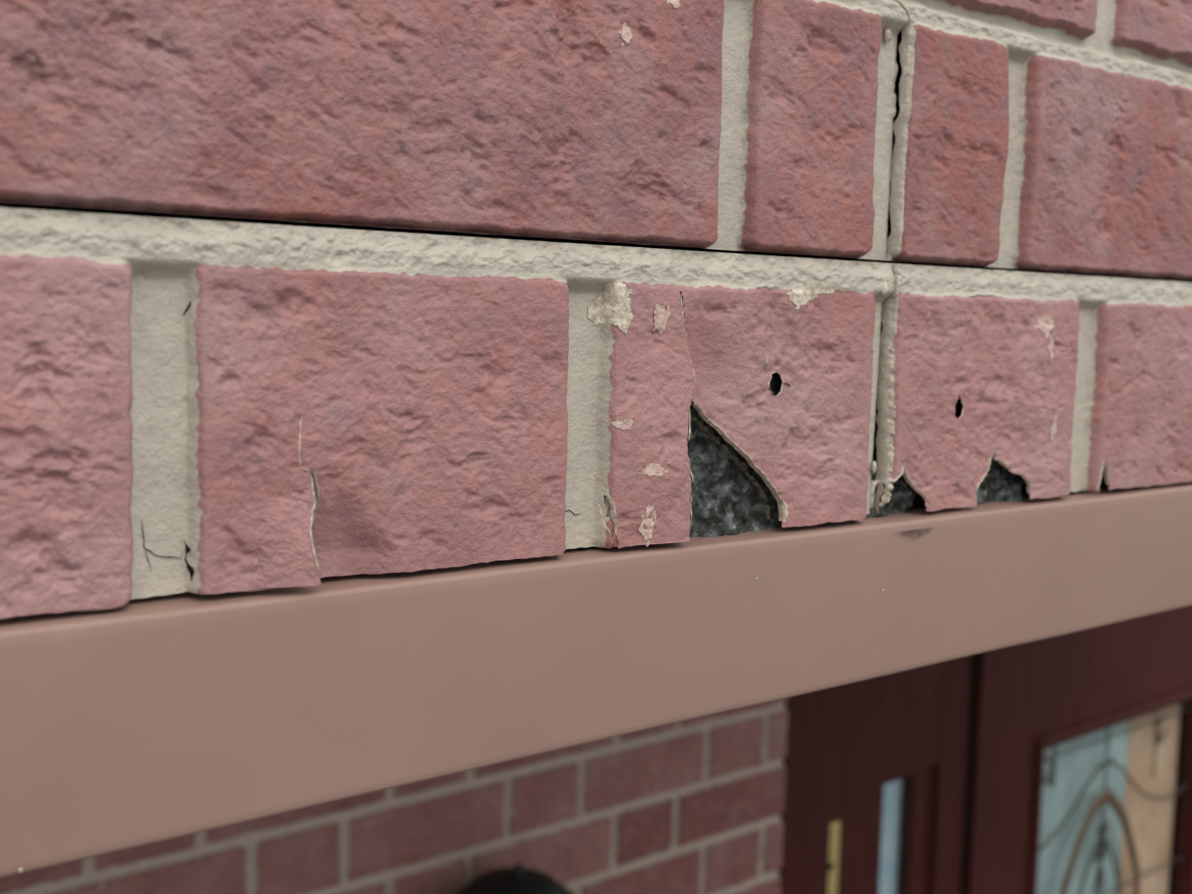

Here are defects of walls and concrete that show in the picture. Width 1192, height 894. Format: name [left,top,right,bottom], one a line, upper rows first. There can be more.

crack [884,28,892,43]
peeling [588,278,633,333]
peeling [653,304,670,334]
crack [880,281,888,297]
spalling [769,376,782,396]
crack [871,341,896,506]
crack [298,414,329,579]
peeling [639,462,671,477]
spalling [687,401,788,538]
spalling [866,466,931,518]
spalling [975,451,1032,505]
peeling [638,505,657,547]